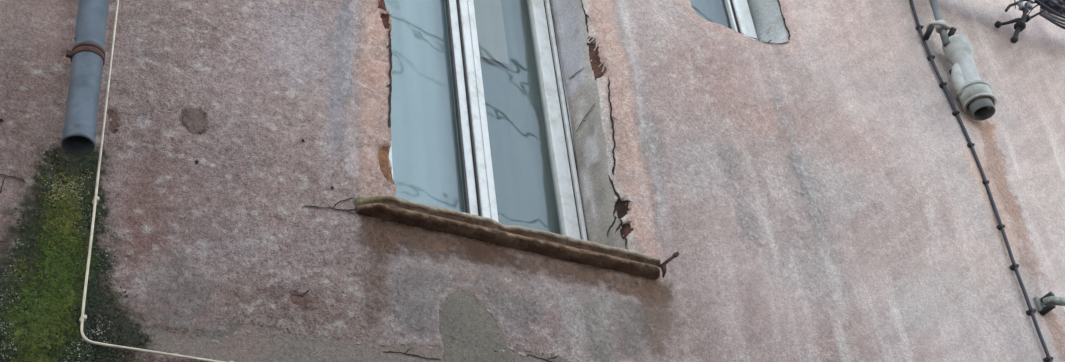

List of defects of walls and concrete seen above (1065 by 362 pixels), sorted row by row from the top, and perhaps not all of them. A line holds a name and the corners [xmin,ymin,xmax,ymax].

spalling [377,0,390,29]
crack [581,0,590,34]
spalling [586,36,607,79]
spalling [378,146,392,184]
crack [576,77,631,248]
flaking render [127,313,443,362]
flaking render [493,346,575,362]